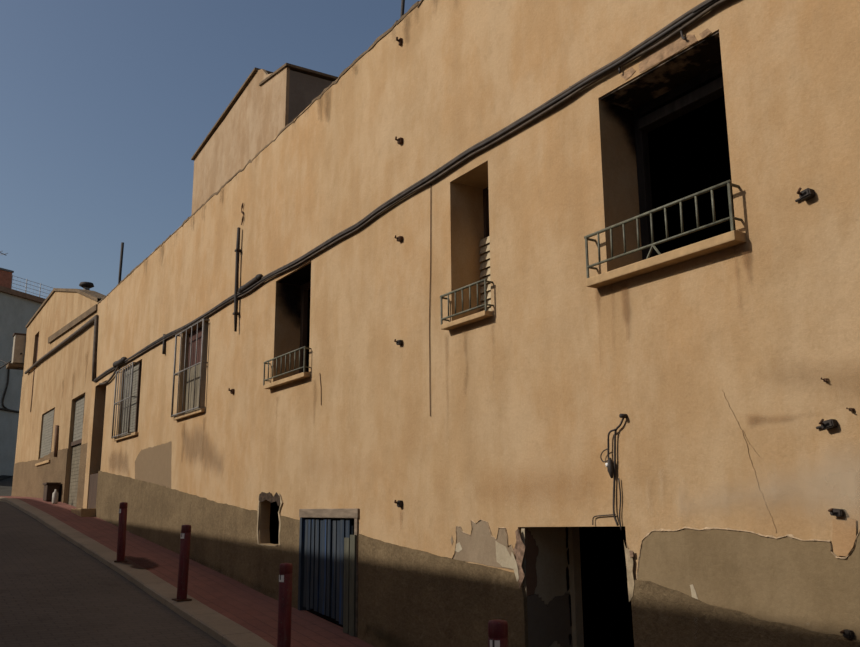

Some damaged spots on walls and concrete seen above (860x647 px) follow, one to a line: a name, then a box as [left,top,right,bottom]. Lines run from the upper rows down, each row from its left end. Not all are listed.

peeling [451,519,573,647]
peeling [624,517,860,640]